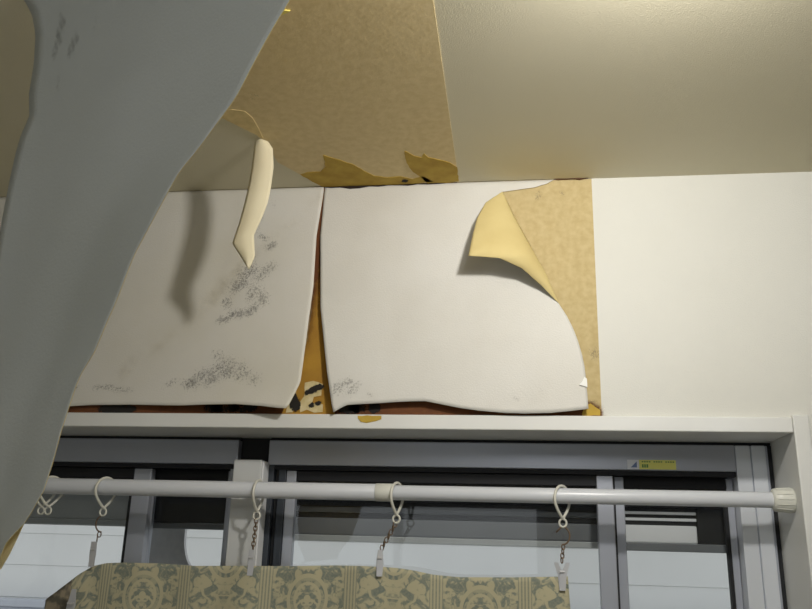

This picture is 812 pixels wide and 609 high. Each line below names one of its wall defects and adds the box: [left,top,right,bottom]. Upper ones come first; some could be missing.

peeling [222,0,460,269]
peeling [282,270,335,414]
peeling [503,179,602,416]